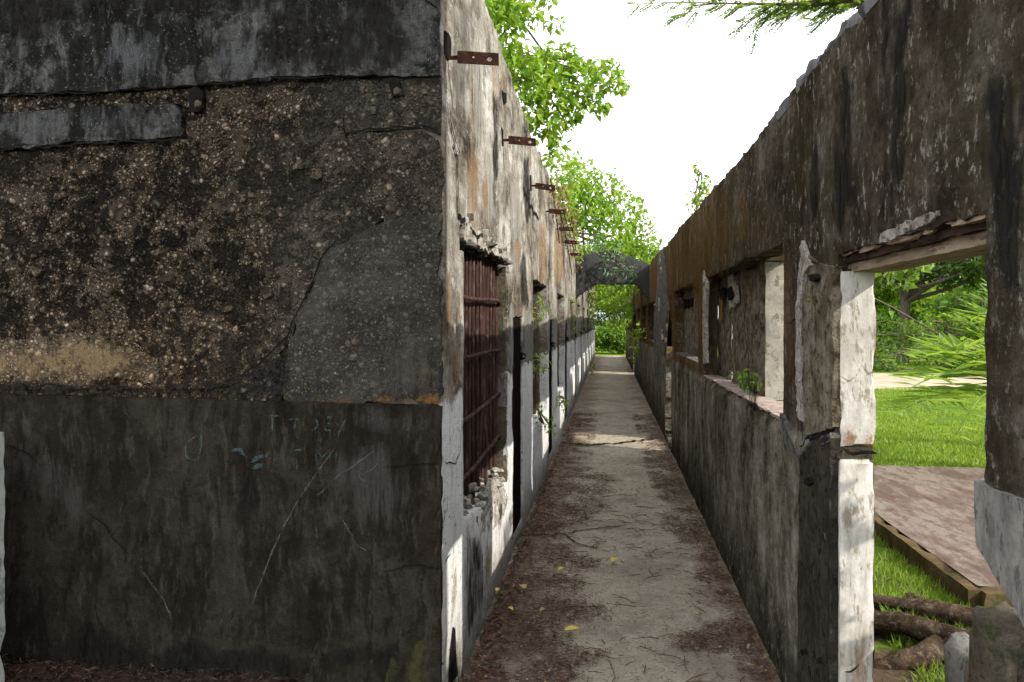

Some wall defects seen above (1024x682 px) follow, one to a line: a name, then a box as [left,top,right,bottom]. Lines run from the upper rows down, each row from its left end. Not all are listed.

spalling [457,212,513,266]
damp [831,68,852,231]
damp [881,0,910,204]
damp [983,74,1024,301]
spalling [463,467,508,532]
crack [800,420,877,456]